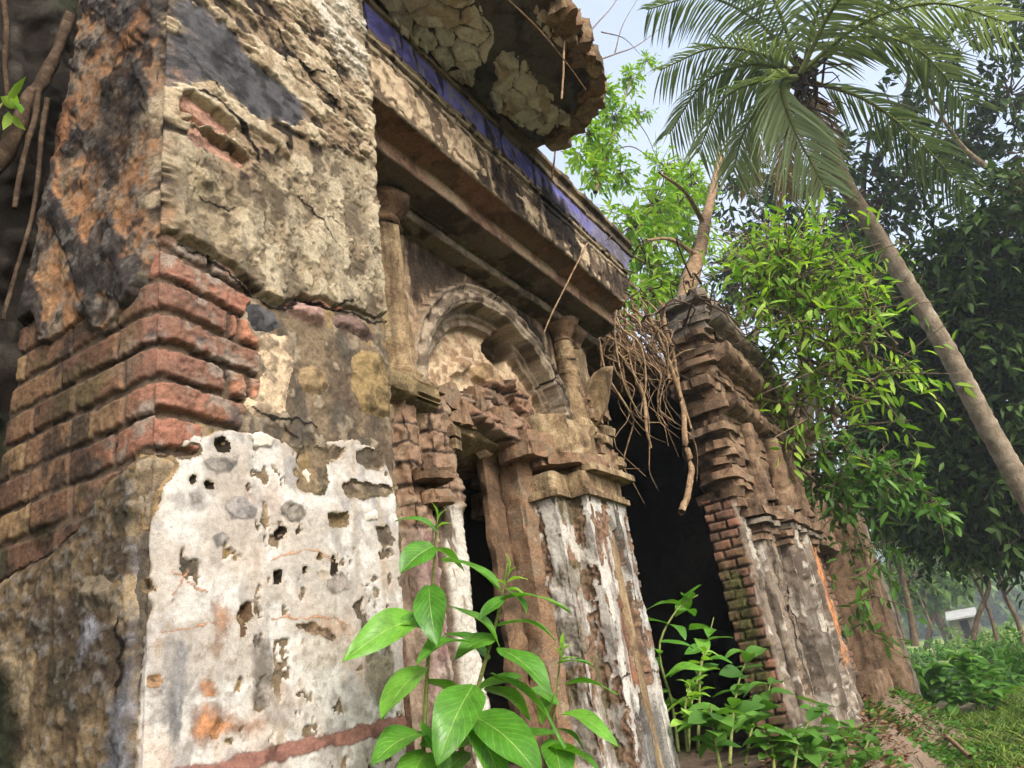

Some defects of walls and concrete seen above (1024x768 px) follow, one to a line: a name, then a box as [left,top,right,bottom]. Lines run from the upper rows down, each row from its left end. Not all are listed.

flaking render [161,16,182,36]
flaking render [170,0,487,176]
flaking render [379,0,573,136]
crack [177,243,387,324]
crack [247,405,318,437]
flaking render [0,234,406,768]
spalling [566,496,661,748]
spalling [771,540,798,629]
spalling [795,641,825,732]